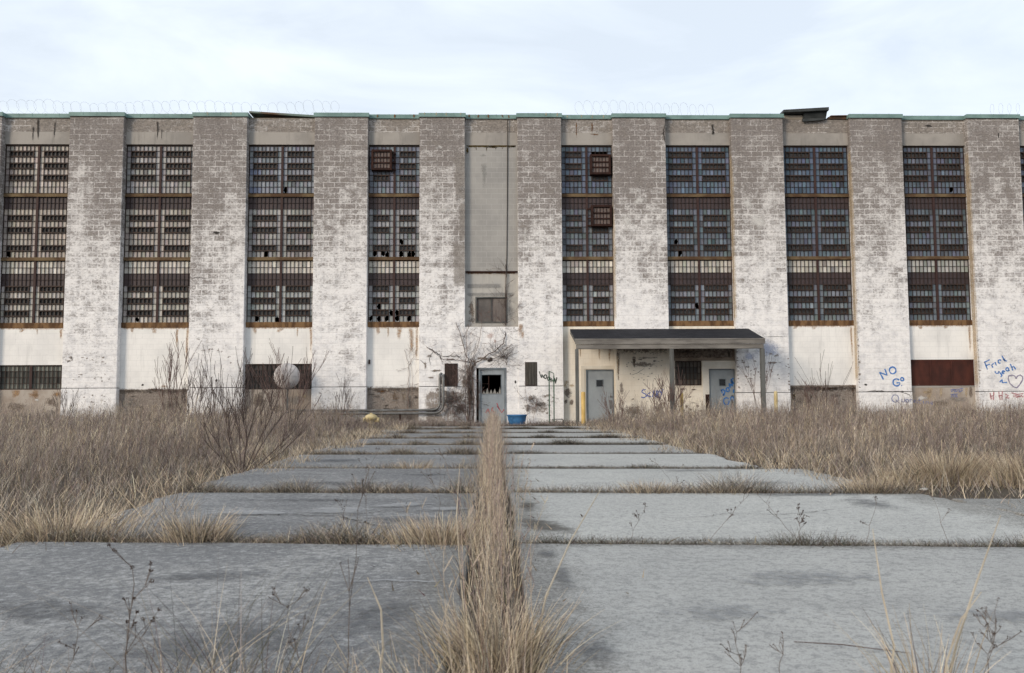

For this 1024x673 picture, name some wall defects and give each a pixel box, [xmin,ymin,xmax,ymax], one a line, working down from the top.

corrosion [909,155,979,395]